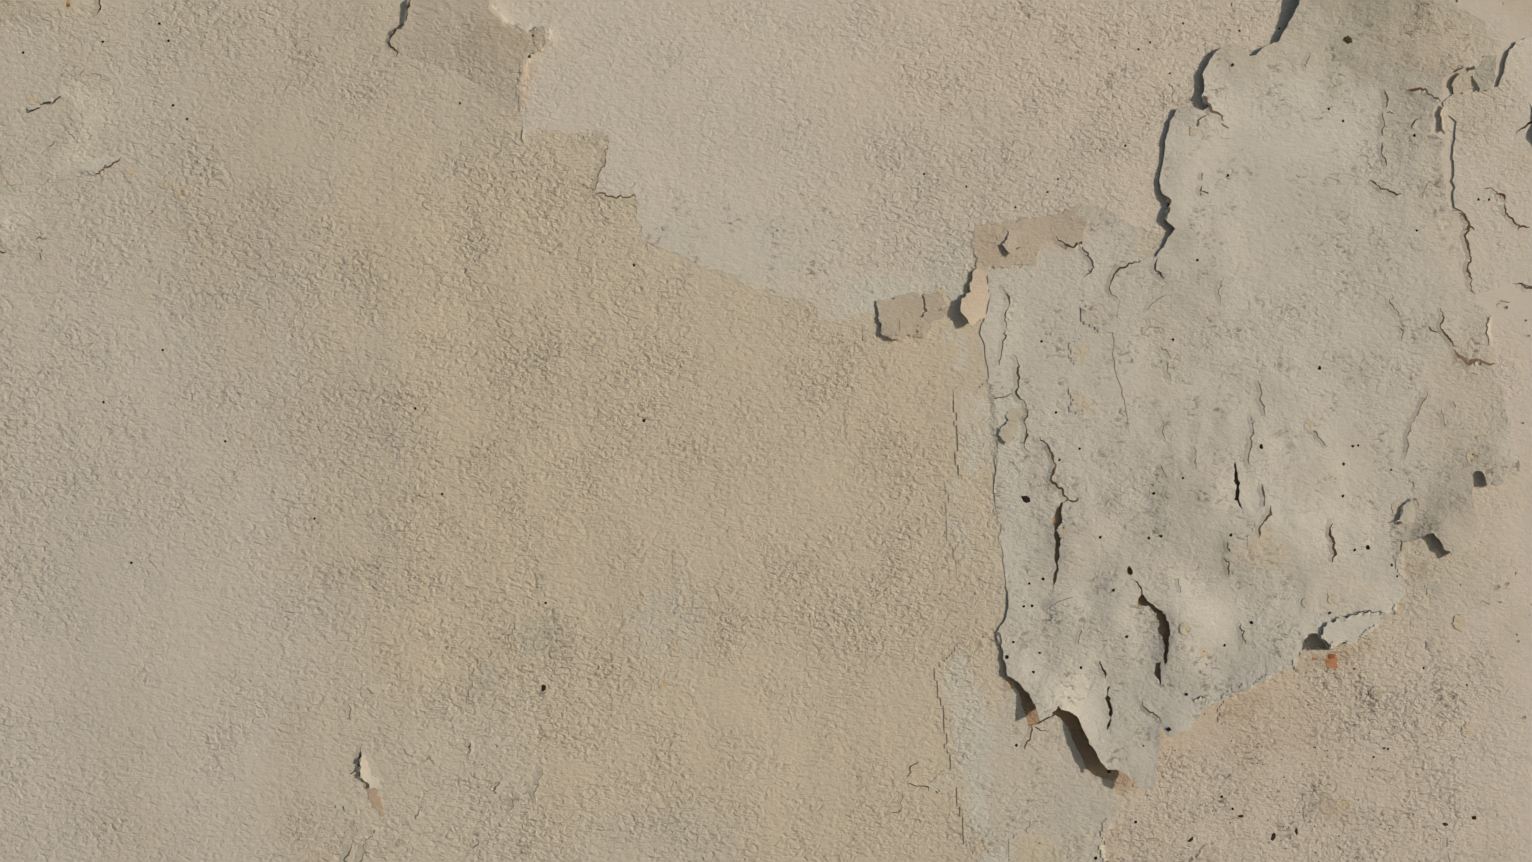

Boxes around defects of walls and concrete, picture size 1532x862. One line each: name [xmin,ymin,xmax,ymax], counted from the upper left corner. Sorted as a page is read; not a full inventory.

peeling [0,0,103,25]
crack [1196,95,1229,128]
crack [1160,171,1208,221]
crack [1369,87,1532,506]
peeling [390,0,1525,862]
crack [994,289,1079,503]
crack [1053,236,1197,501]
crack [1222,380,1272,579]
crack [1310,428,1327,450]
crack [1236,623,1246,645]
crack [344,701,363,782]
crack [339,819,379,862]